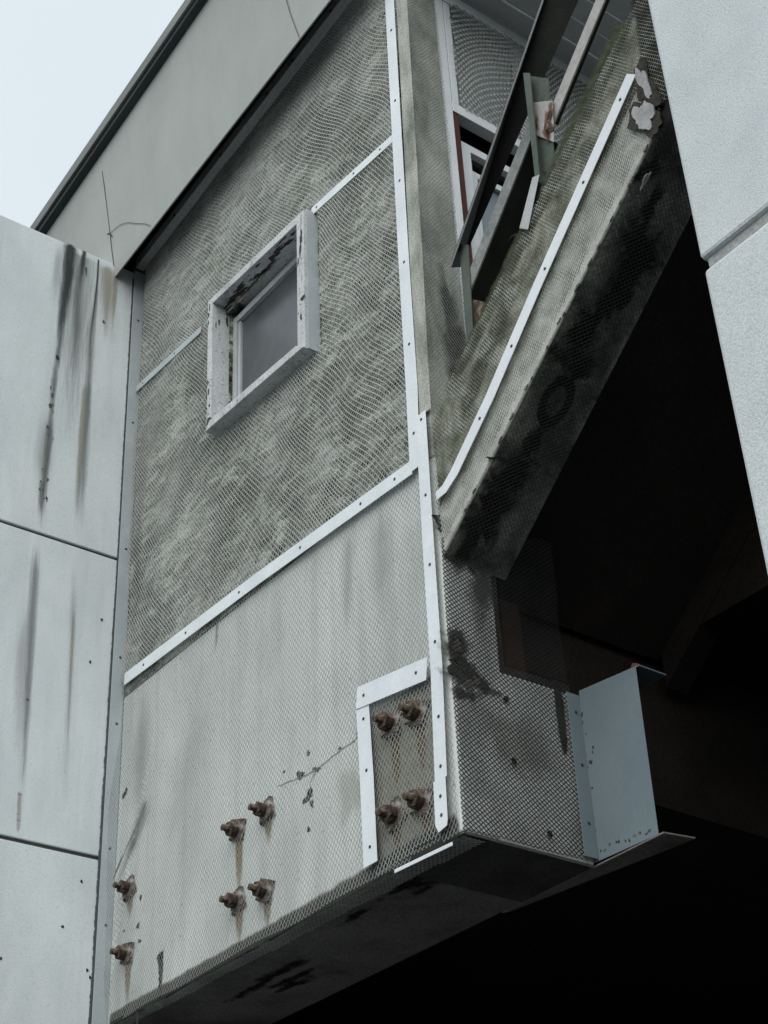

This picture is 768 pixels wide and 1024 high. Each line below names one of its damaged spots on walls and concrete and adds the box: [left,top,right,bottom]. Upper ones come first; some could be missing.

flaking render [627,56,663,152]
peeling [208,214,305,329]
damp [56,244,118,480]
damp [453,155,664,563]
damp [39,383,55,503]
damp [25,566,36,733]
crack [279,738,356,789]